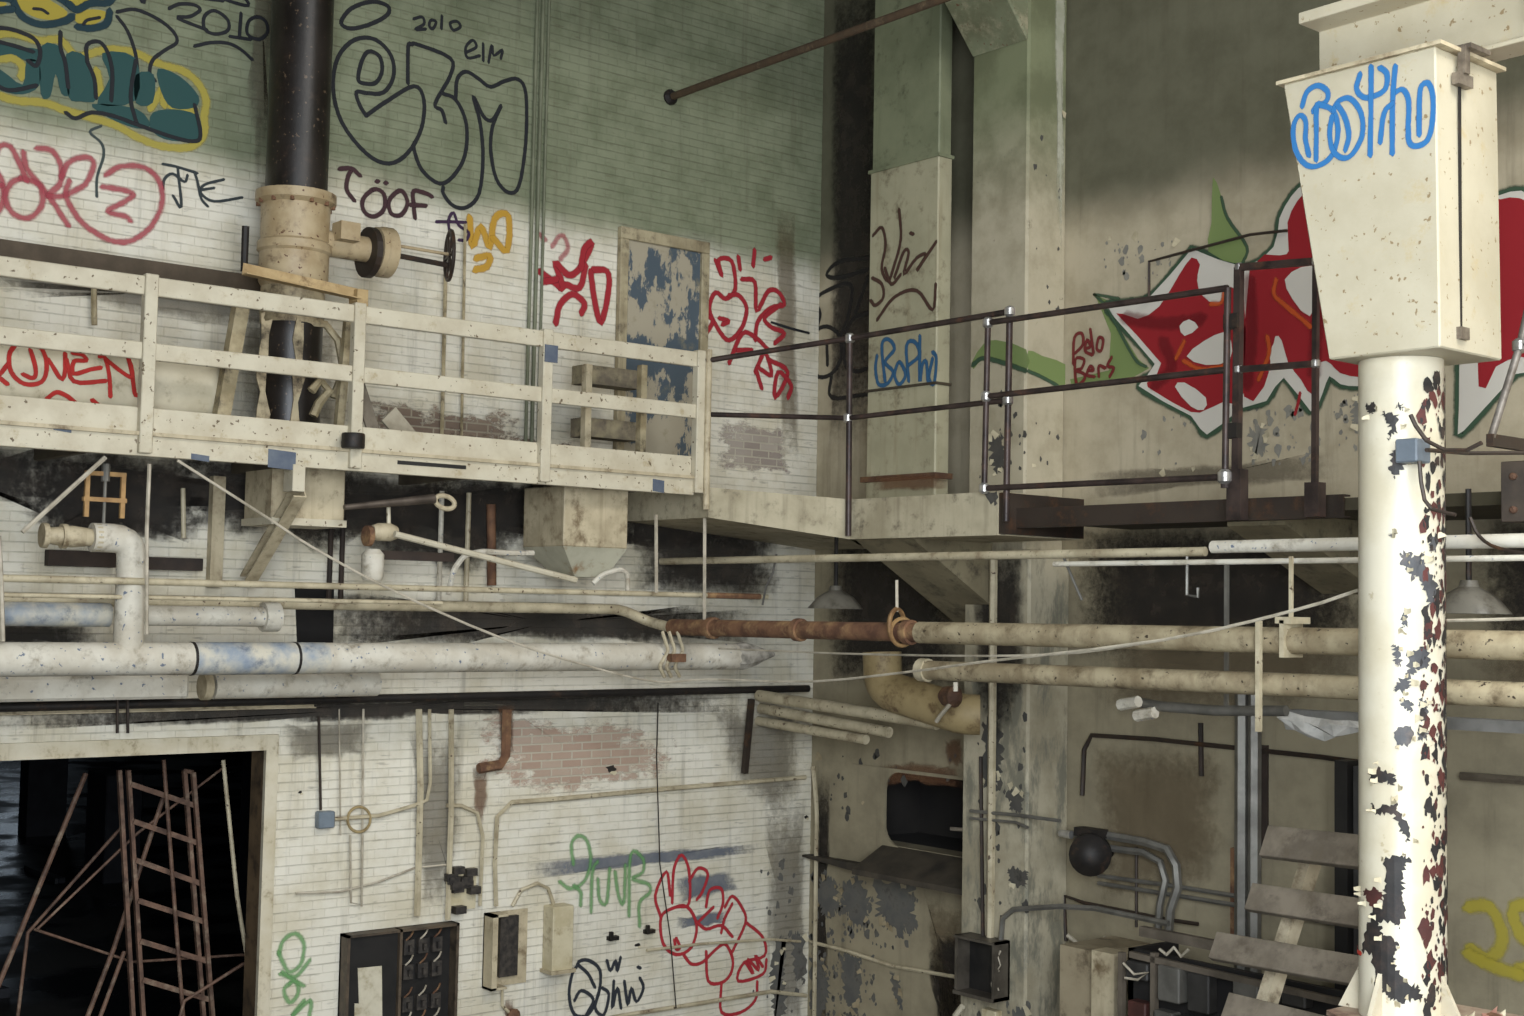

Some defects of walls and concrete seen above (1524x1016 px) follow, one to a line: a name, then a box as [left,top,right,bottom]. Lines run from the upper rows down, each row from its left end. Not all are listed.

peeling [1141,430,1196,477]
peeling [1247,405,1321,466]
peeling [1334,371,1448,1016]
flaking render [481,717,666,790]